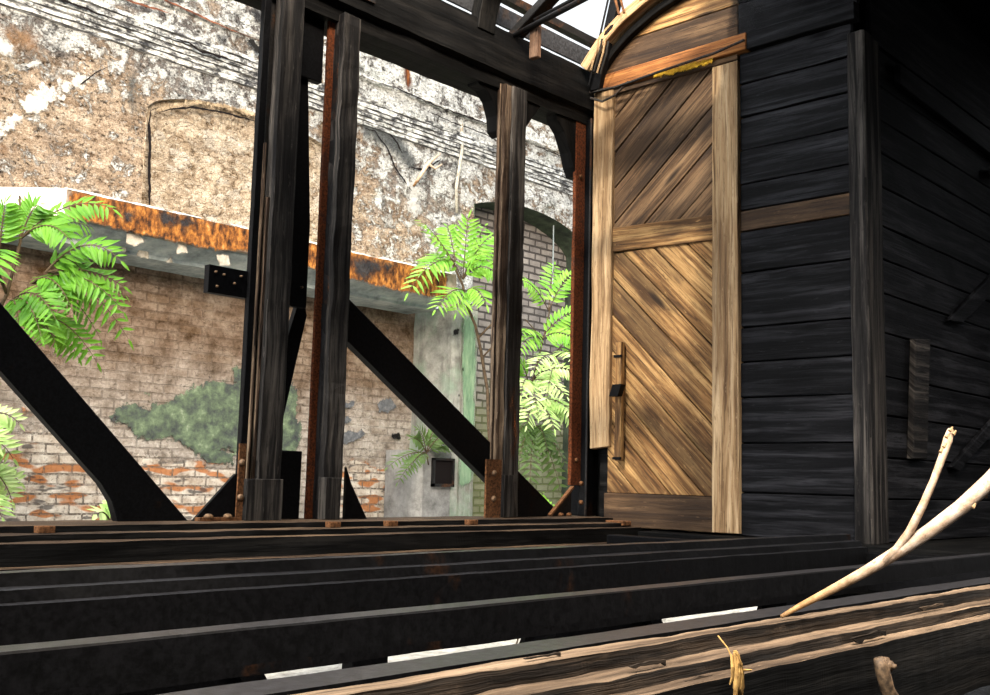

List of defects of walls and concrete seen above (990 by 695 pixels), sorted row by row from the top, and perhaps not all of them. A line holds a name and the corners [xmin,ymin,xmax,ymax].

leakage [0,28,38,63]
leakage [0,67,90,152]
corrosion [69,191,249,251]
corrosion [308,243,317,269]
corrosion [350,252,448,298]
flaking render [0,429,105,521]
peeling [109,366,241,520]
peeling [282,382,302,451]